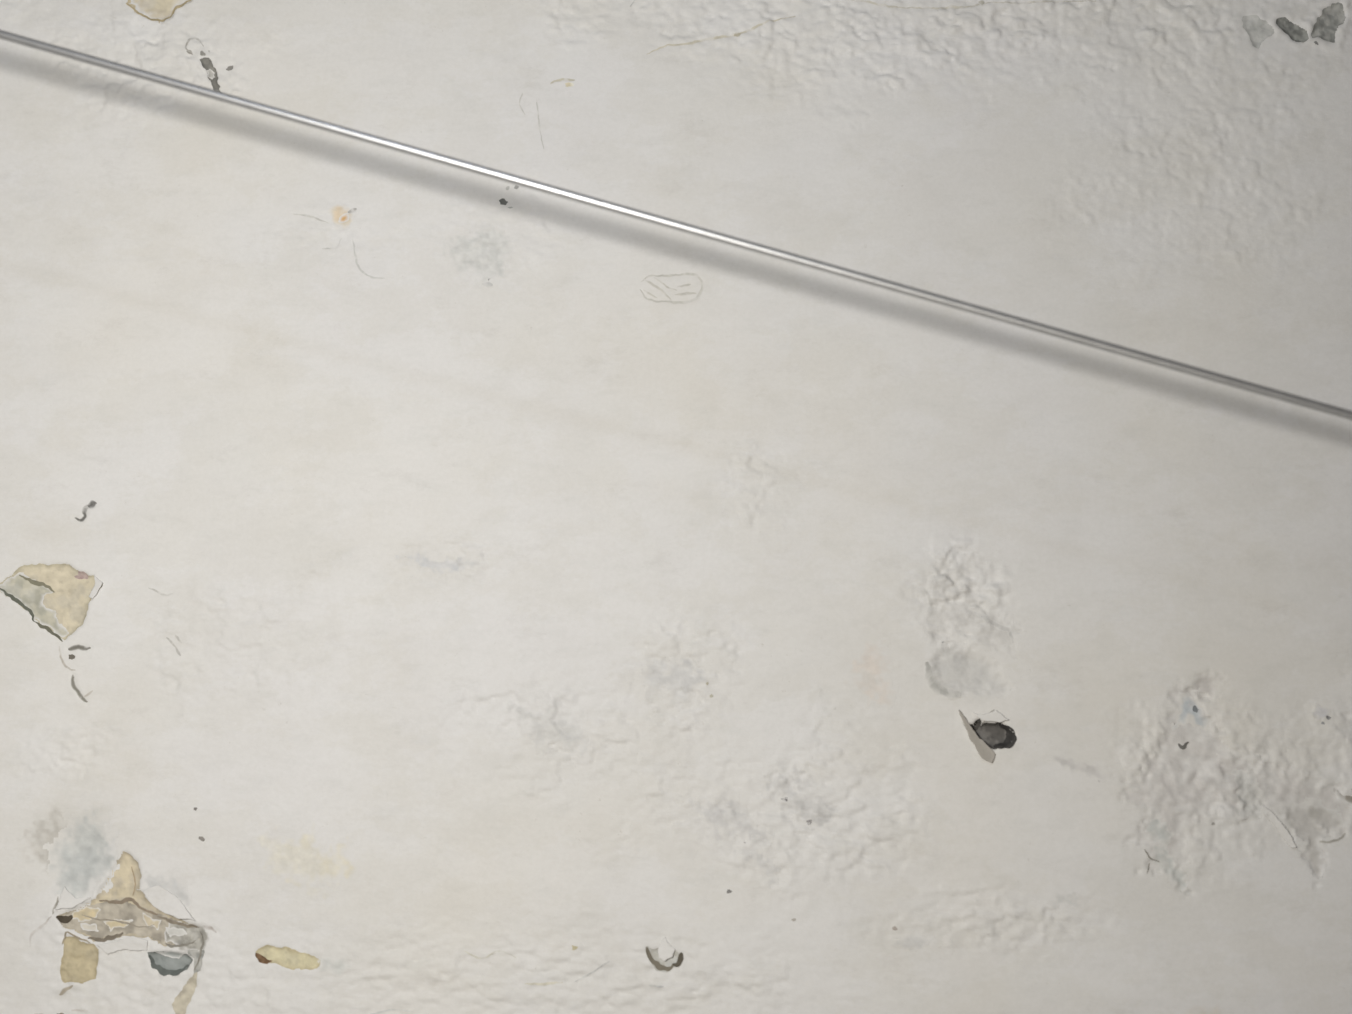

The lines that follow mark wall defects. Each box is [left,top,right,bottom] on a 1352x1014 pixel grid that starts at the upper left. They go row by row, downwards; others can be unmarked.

spalling [126,0,192,24]
spalling [1242,2,1346,49]
spalling [0,563,103,642]
peeling [1116,684,1352,896]
spalling [28,851,216,1014]
spalling [255,945,355,977]